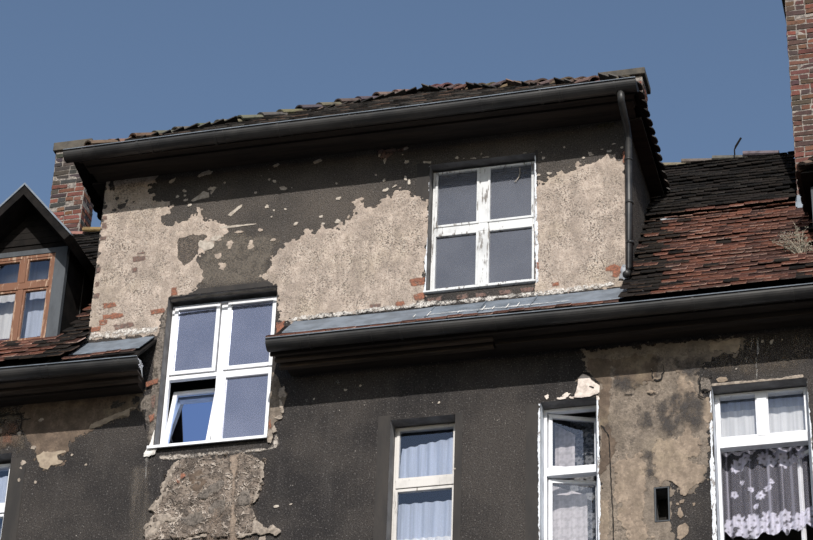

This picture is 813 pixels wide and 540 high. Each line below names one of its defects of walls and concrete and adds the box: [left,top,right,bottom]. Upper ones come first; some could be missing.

peeling [499,143,630,296]
peeling [18,174,441,482]
spalling [143,452,281,540]
peeling [575,335,804,540]